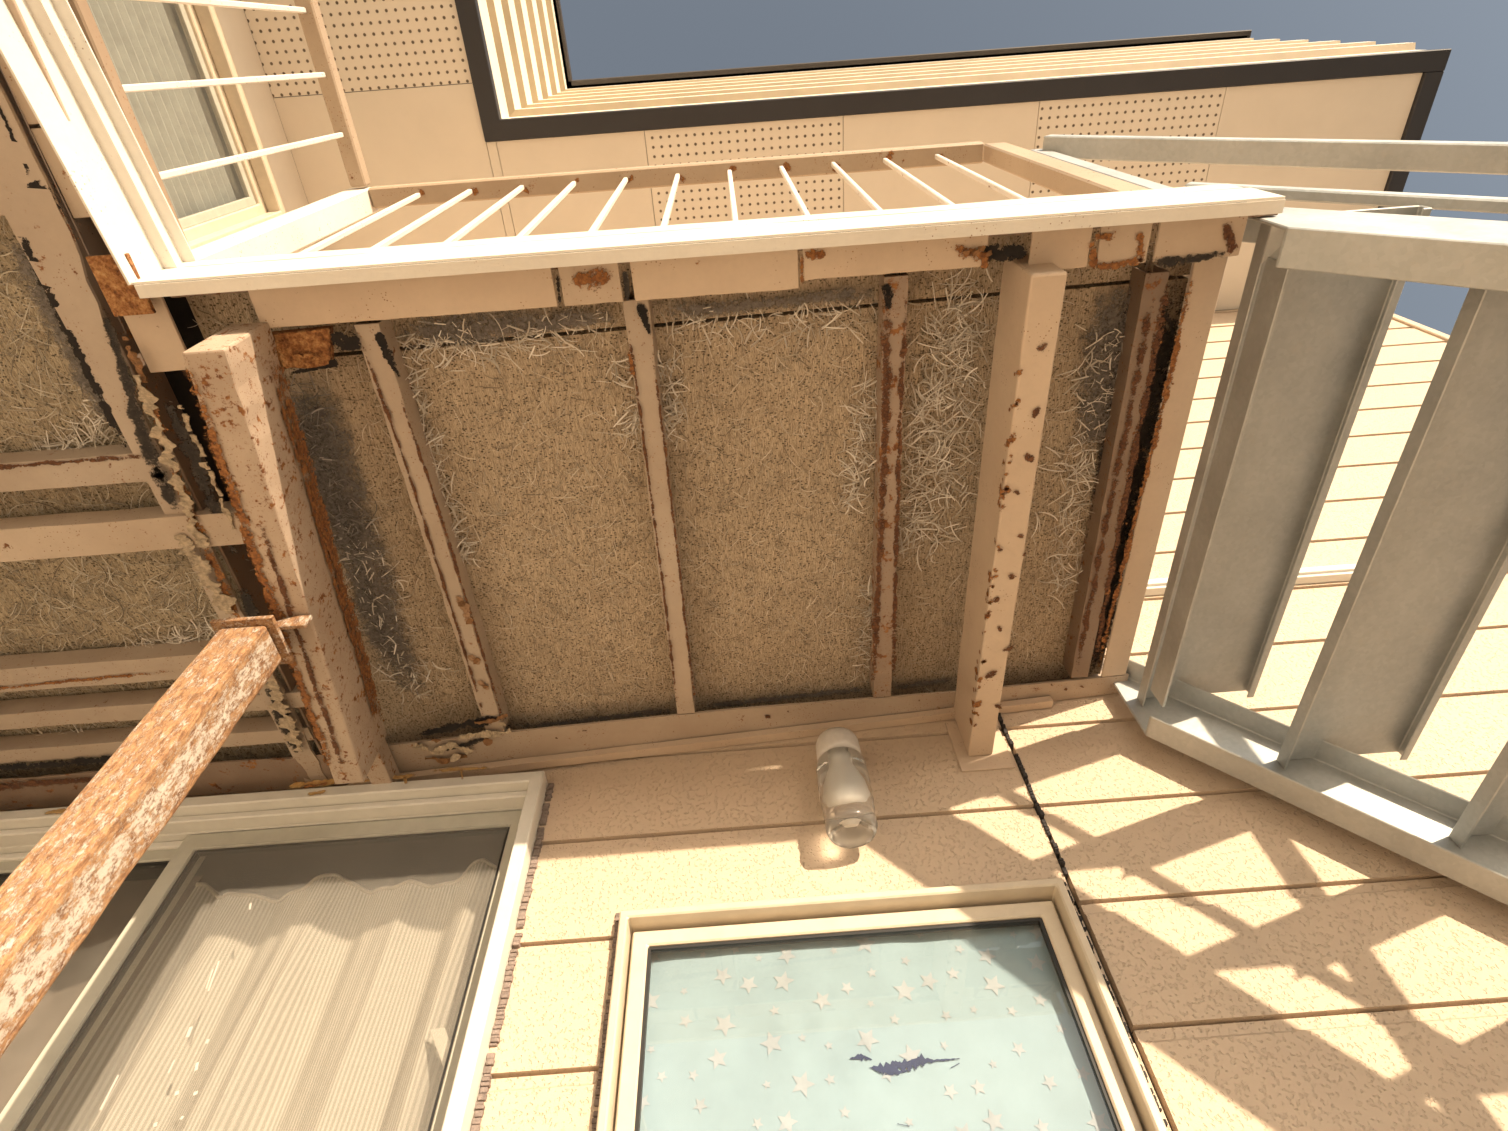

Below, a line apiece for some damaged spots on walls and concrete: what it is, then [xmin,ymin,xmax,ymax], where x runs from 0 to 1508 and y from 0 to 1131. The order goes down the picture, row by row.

corrosion [0,237,343,796]
corrosion [268,347,385,733]
corrosion [363,329,504,720]
peeling [412,713,512,764]
corrosion [556,267,695,702]
corrosion [871,284,908,680]
corrosion [955,242,1027,269]
corrosion [970,538,1016,727]
corrosion [997,433,1034,510]
corrosion [1076,224,1238,669]